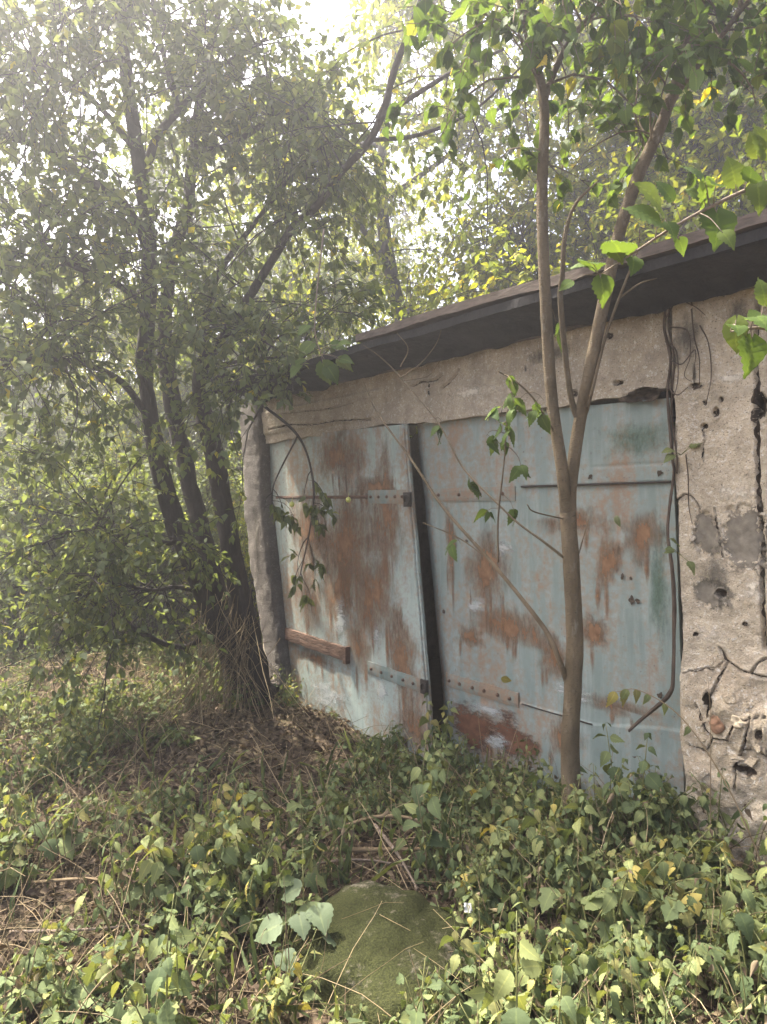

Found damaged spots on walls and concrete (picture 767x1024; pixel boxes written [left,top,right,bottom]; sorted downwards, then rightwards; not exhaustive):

spalling [617,380,665,403]
corrosion [296,449,414,718]
corrosion [447,516,456,598]
corrosion [459,534,564,684]
corrosion [583,618,603,662]
corrosion [596,515,655,608]
flaking render [693,577,733,610]
crack [688,369,767,787]
flaking render [689,502,767,575]
corrosion [450,704,562,767]
spalling [732,765,757,777]